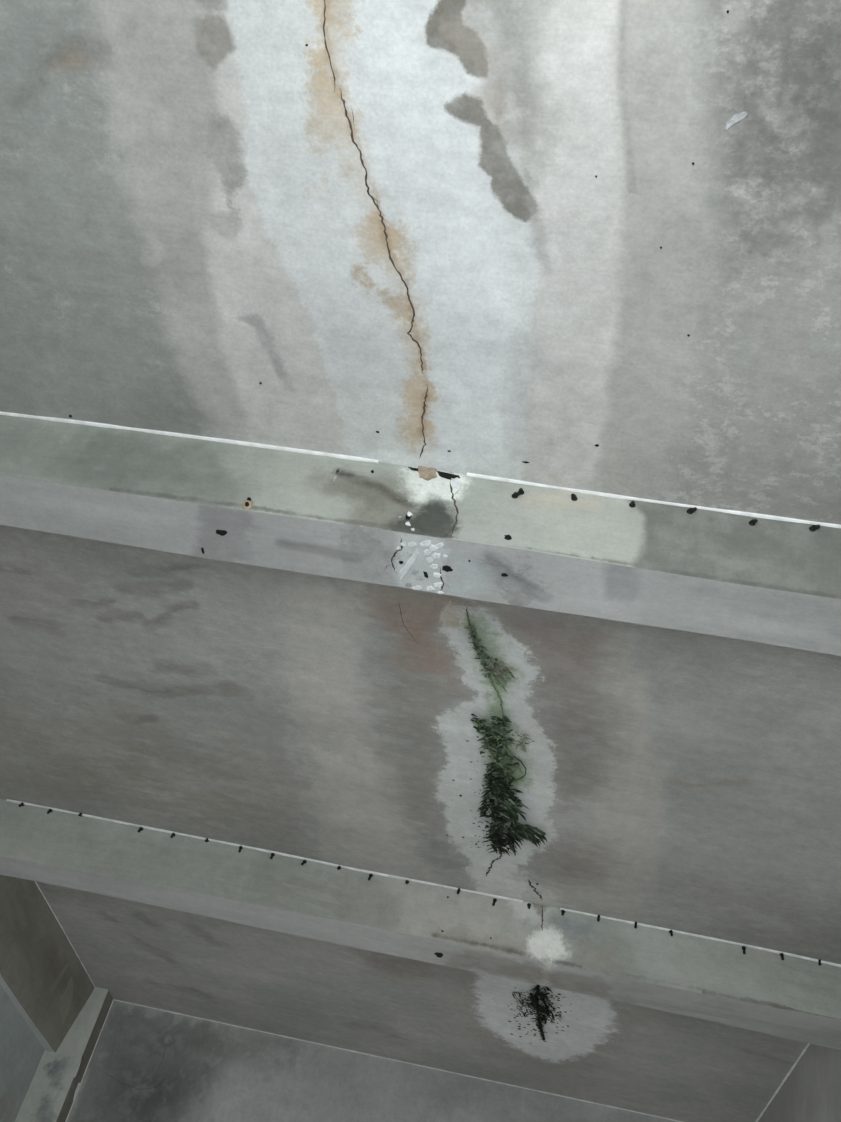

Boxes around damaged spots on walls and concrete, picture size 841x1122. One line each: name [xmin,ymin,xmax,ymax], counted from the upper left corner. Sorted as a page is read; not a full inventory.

rust [273,0,464,444]
crack [323,0,428,459]
water stain [0,0,841,525]
water stain [0,415,841,965]
water stain [56,839,841,1122]